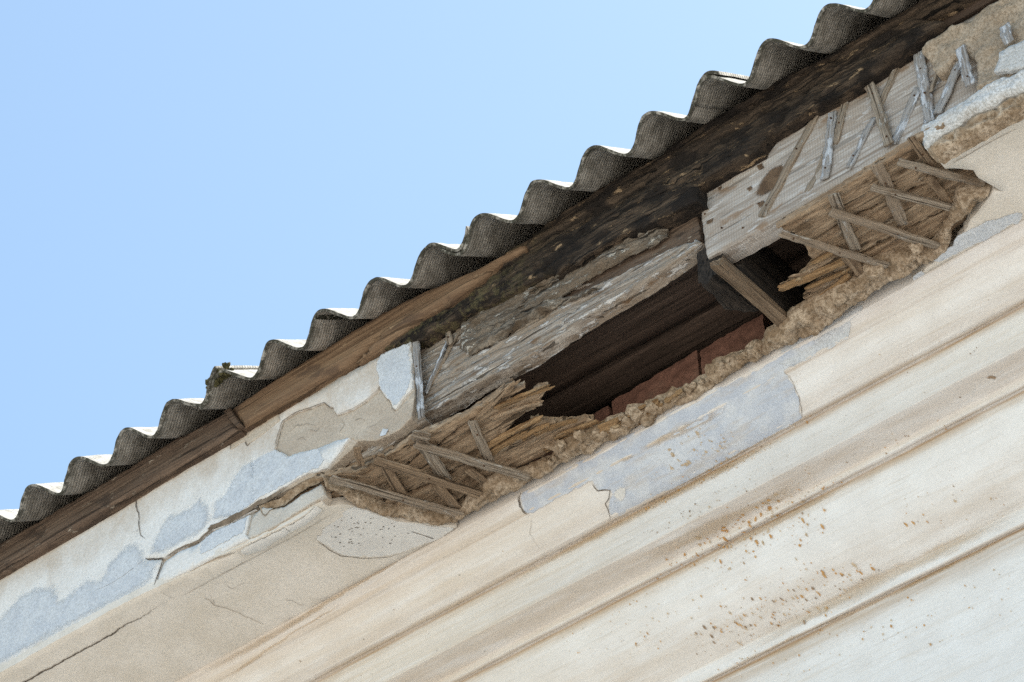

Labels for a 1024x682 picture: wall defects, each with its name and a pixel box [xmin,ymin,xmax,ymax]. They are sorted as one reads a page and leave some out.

crack [24,488,398,682]
peeling [0,182,1022,661]
rust [645,428,781,512]
rust [653,464,880,677]